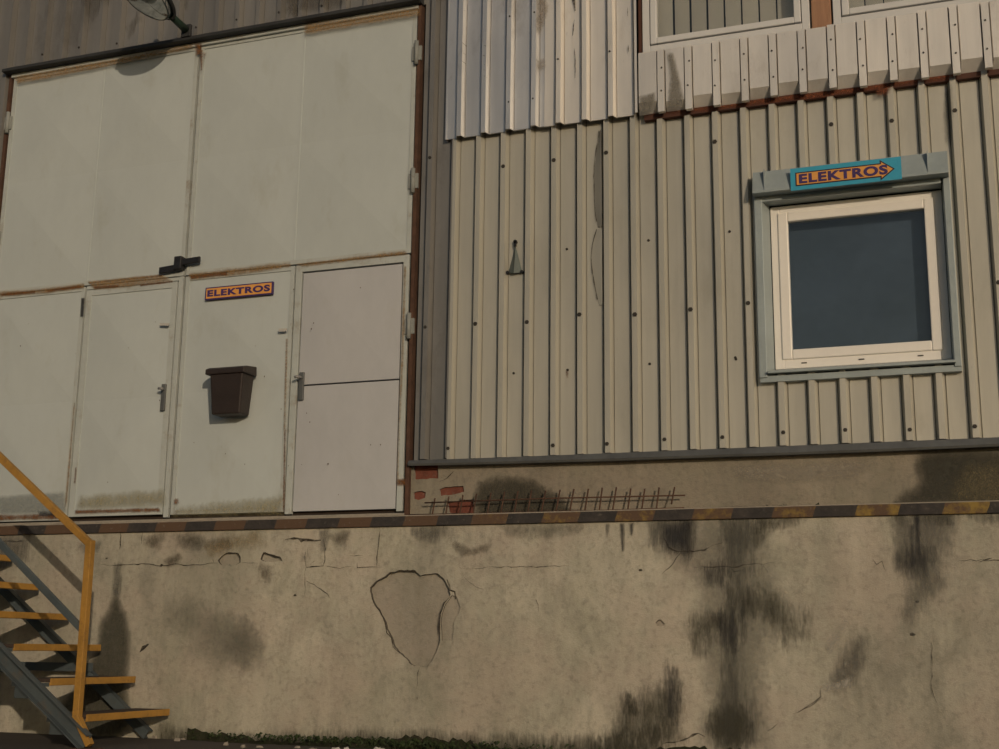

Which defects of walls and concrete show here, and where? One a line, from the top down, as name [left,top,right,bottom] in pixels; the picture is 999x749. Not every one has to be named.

spalling [414,466,474,513]
leakage [899,451,999,503]
peeling [370,570,460,667]